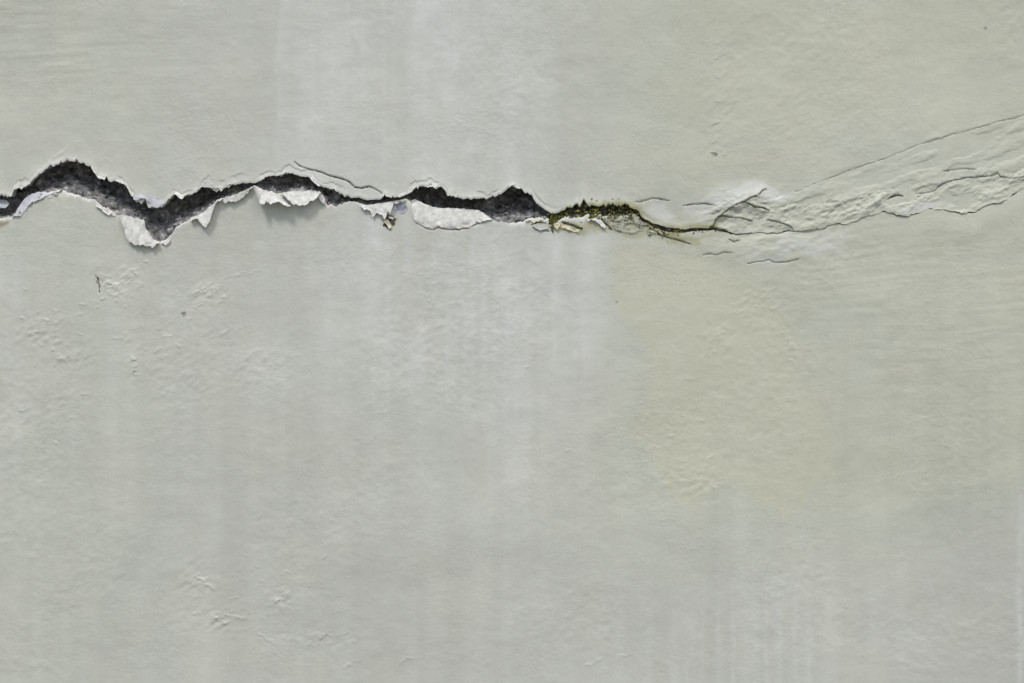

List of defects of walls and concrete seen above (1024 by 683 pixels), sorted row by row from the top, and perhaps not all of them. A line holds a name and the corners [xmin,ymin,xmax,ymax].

peeling [359,200,408,231]
crack [0,161,1024,255]
damp [184,0,703,589]